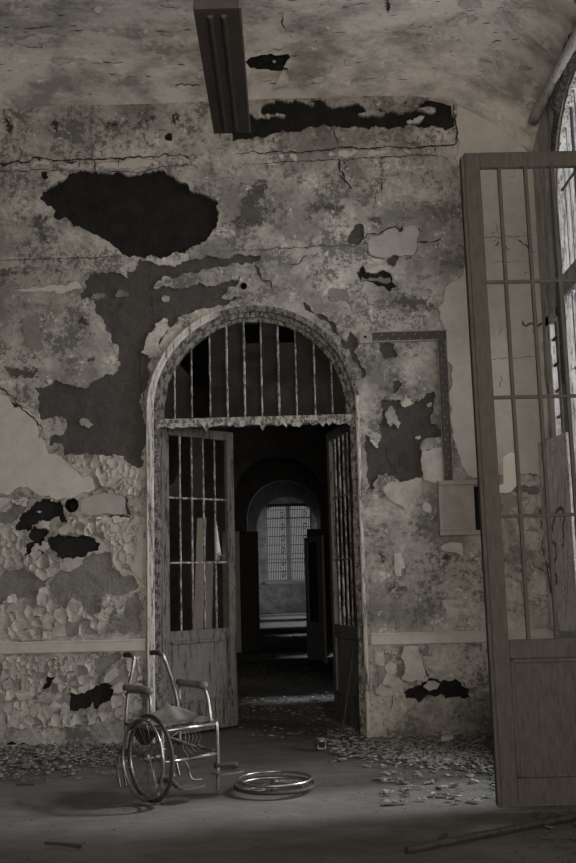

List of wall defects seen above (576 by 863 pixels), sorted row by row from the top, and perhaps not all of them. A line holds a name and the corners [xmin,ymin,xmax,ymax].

crack [4,6,83,48]
crack [418,1,522,43]
spalling [246,54,290,88]
spalling [231,100,454,141]
crack [0,153,197,177]
peeling [231,179,276,230]
spalling [347,216,382,245]
spalling [357,256,436,311]
spalling [0,171,261,496]
spalling [379,342,397,360]
spalling [364,381,445,513]
peeling [379,553,407,593]